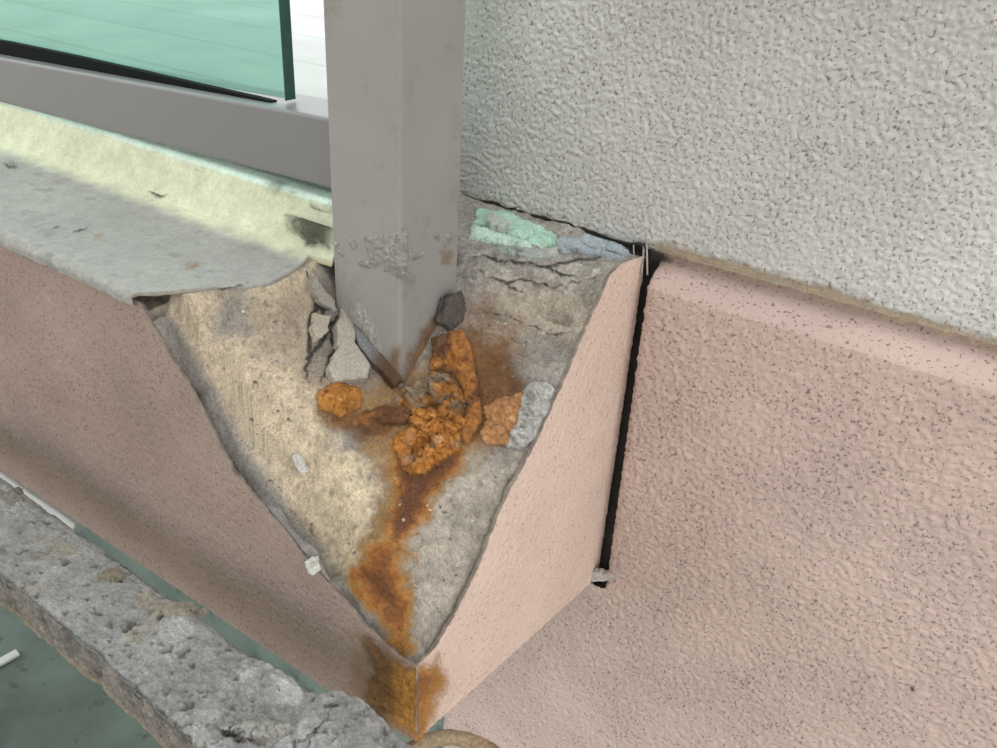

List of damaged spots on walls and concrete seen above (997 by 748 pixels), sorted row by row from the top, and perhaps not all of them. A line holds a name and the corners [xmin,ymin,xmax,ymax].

crack [304,300,335,381]
spalling [133,192,639,664]
corrosion [327,319,520,742]